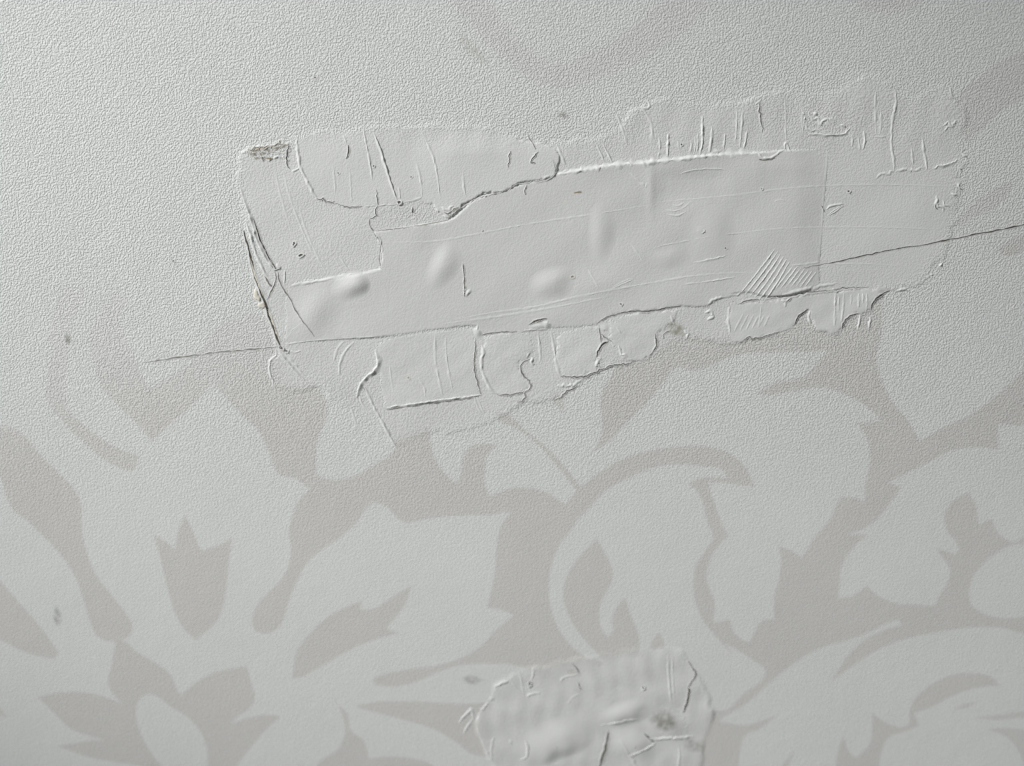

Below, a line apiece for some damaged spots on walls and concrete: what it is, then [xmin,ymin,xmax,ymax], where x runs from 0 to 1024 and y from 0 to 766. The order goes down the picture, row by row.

peeling [239,126,792,220]
crack [143,186,379,363]
crack [362,189,449,274]
peeling [376,324,482,408]
spalling [462,264,472,297]
flaking render [518,353,535,403]
flaking render [524,317,552,332]
flaking render [554,302,681,401]
peeling [704,261,944,344]
crack [805,223,1024,269]